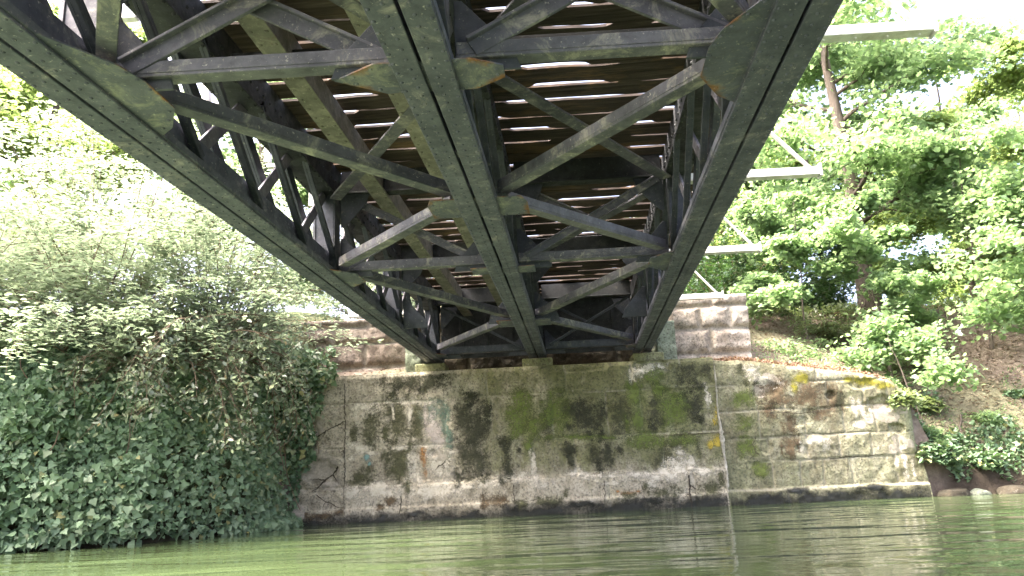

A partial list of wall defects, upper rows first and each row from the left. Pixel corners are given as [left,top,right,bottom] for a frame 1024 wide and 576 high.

crack [313,383,348,508]
damp [303,383,932,526]